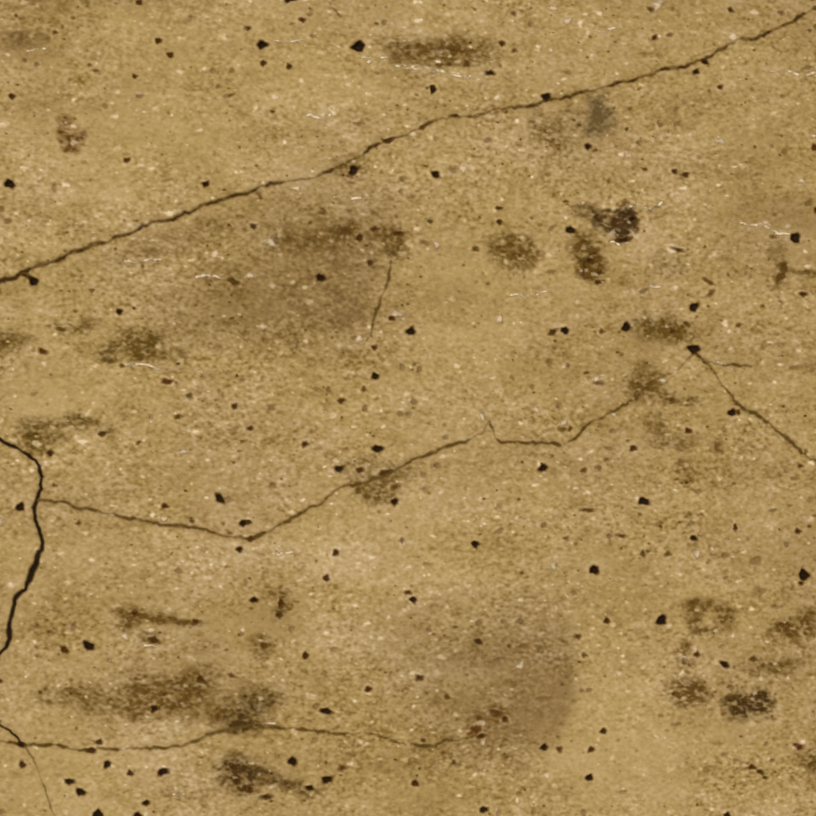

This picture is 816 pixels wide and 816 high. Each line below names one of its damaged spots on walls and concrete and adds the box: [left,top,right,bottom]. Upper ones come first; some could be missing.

crack [608,8,816,87]
crack [0,181,284,284]
leakage [578,205,639,243]
leakage [572,233,604,281]
crack [692,353,816,461]
crack [0,438,470,655]
leakage [67,671,278,734]
leakage [671,681,708,704]
leakage [723,690,774,718]
crack [0,724,119,758]
crack [139,724,348,750]
leakage [217,753,307,795]